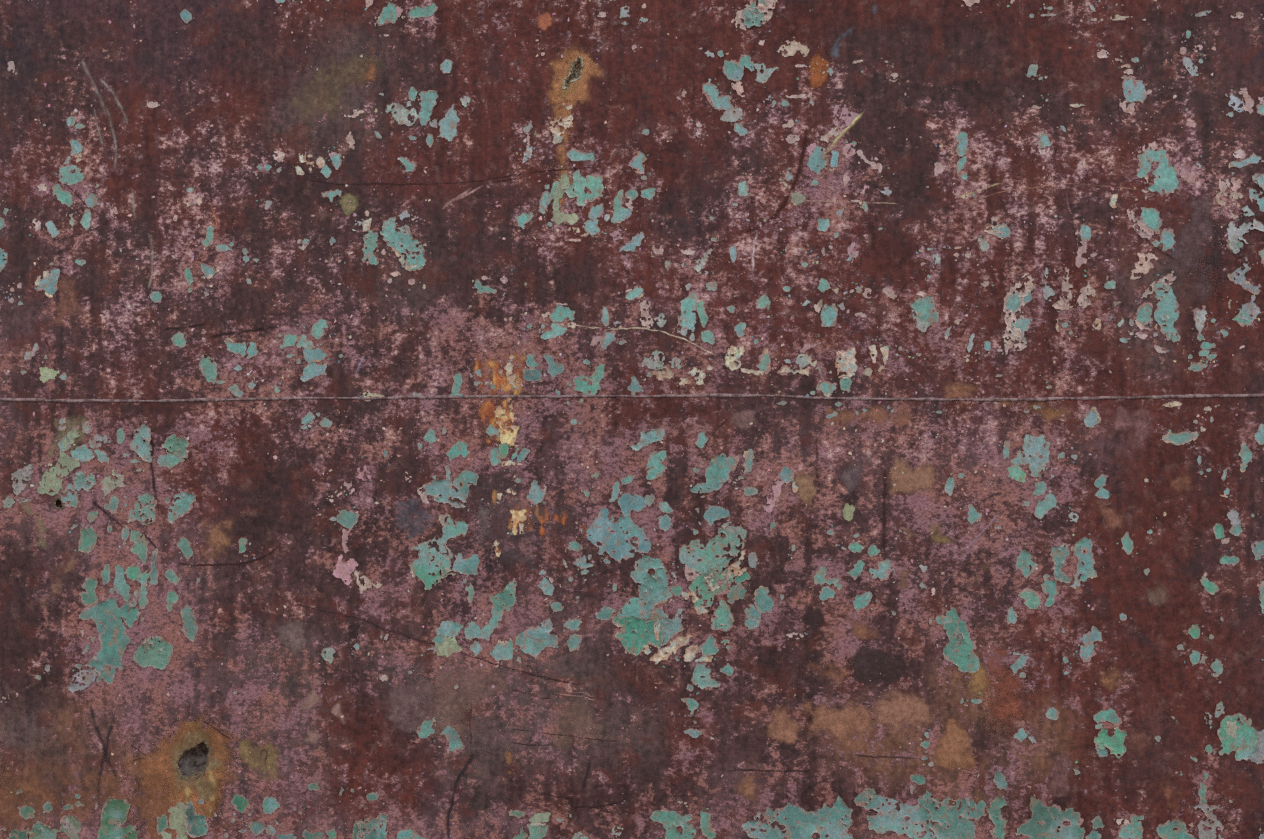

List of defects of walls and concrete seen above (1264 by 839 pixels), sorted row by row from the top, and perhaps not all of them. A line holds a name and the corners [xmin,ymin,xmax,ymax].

corrosion [537,13,552,30]
corrosion [549,50,602,209]
peeling [702,0,892,268]
peeling [515,104,922,419]
peeling [953,141,1264,372]
peeling [2,417,199,693]
corrosion [474,354,527,443]
peeling [450,303,627,535]
peeling [405,427,798,738]
corrosion [889,458,934,495]
corrosion [0,718,278,839]
corrosion [768,691,975,770]